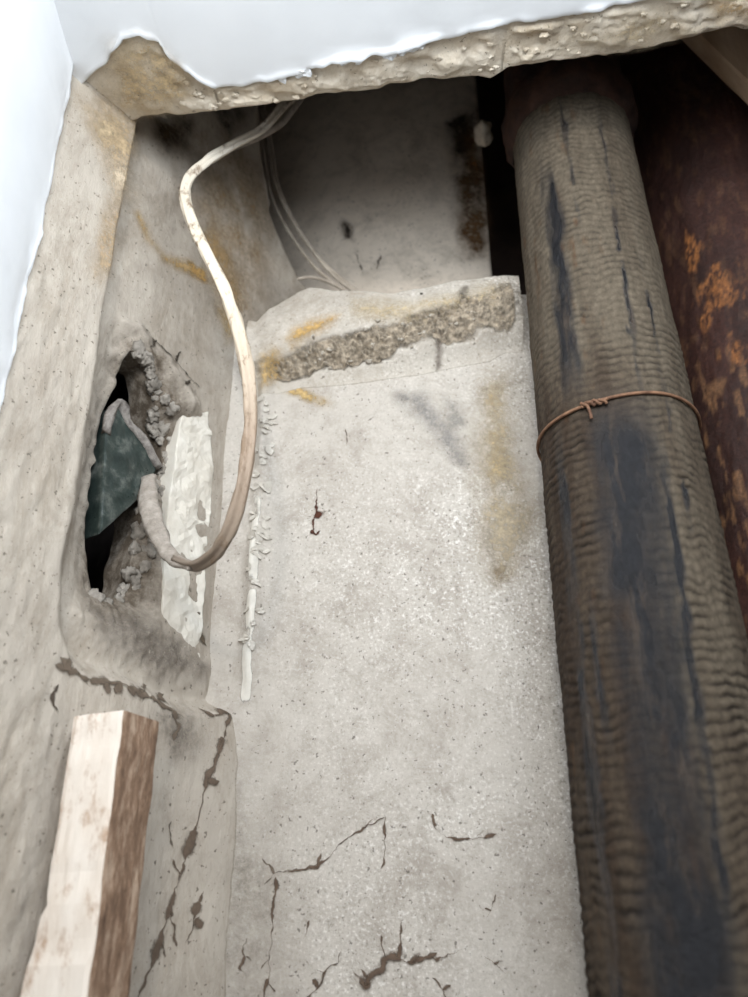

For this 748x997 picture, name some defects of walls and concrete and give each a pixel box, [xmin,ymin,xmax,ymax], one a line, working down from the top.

flaking render [95,0,748,194]
spalling [276,283,515,382]
flaking render [85,339,214,657]
crack [50,657,232,997]
crack [238,817,386,996]
crack [308,922,462,997]
crack [431,814,498,841]